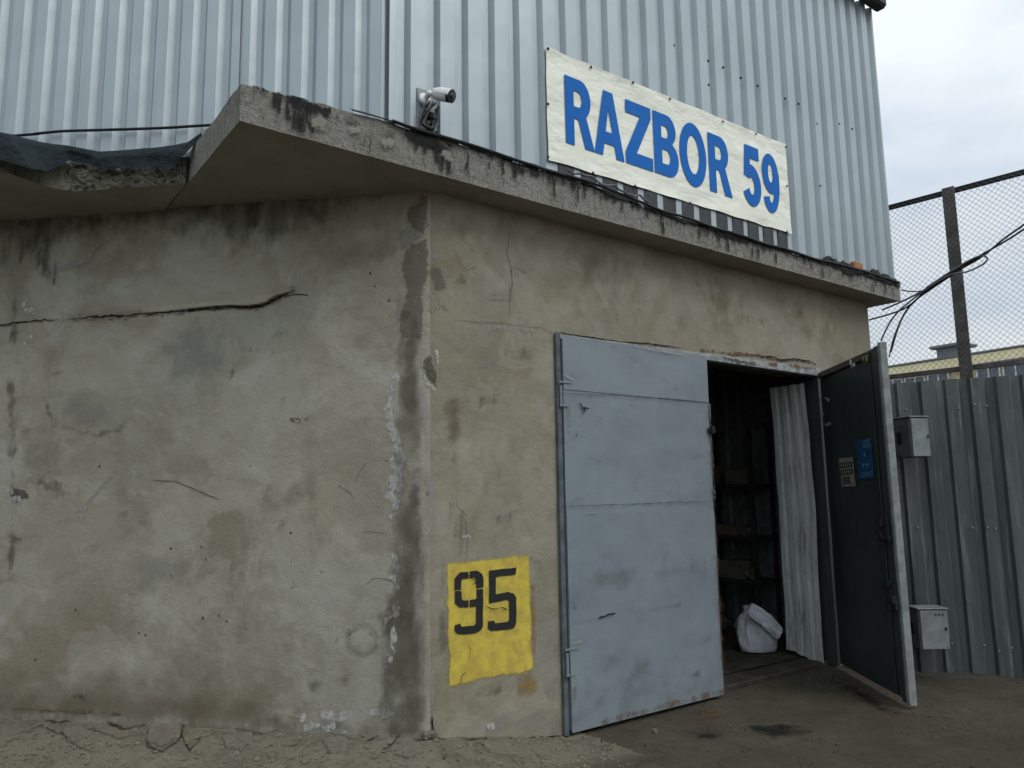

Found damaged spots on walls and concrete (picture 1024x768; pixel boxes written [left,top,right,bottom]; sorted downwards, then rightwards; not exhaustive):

spalling [67,162,186,192]
crack [0,285,304,326]
water stain [383,373,407,520]
water stain [383,554,400,682]
crack [22,717,496,752]